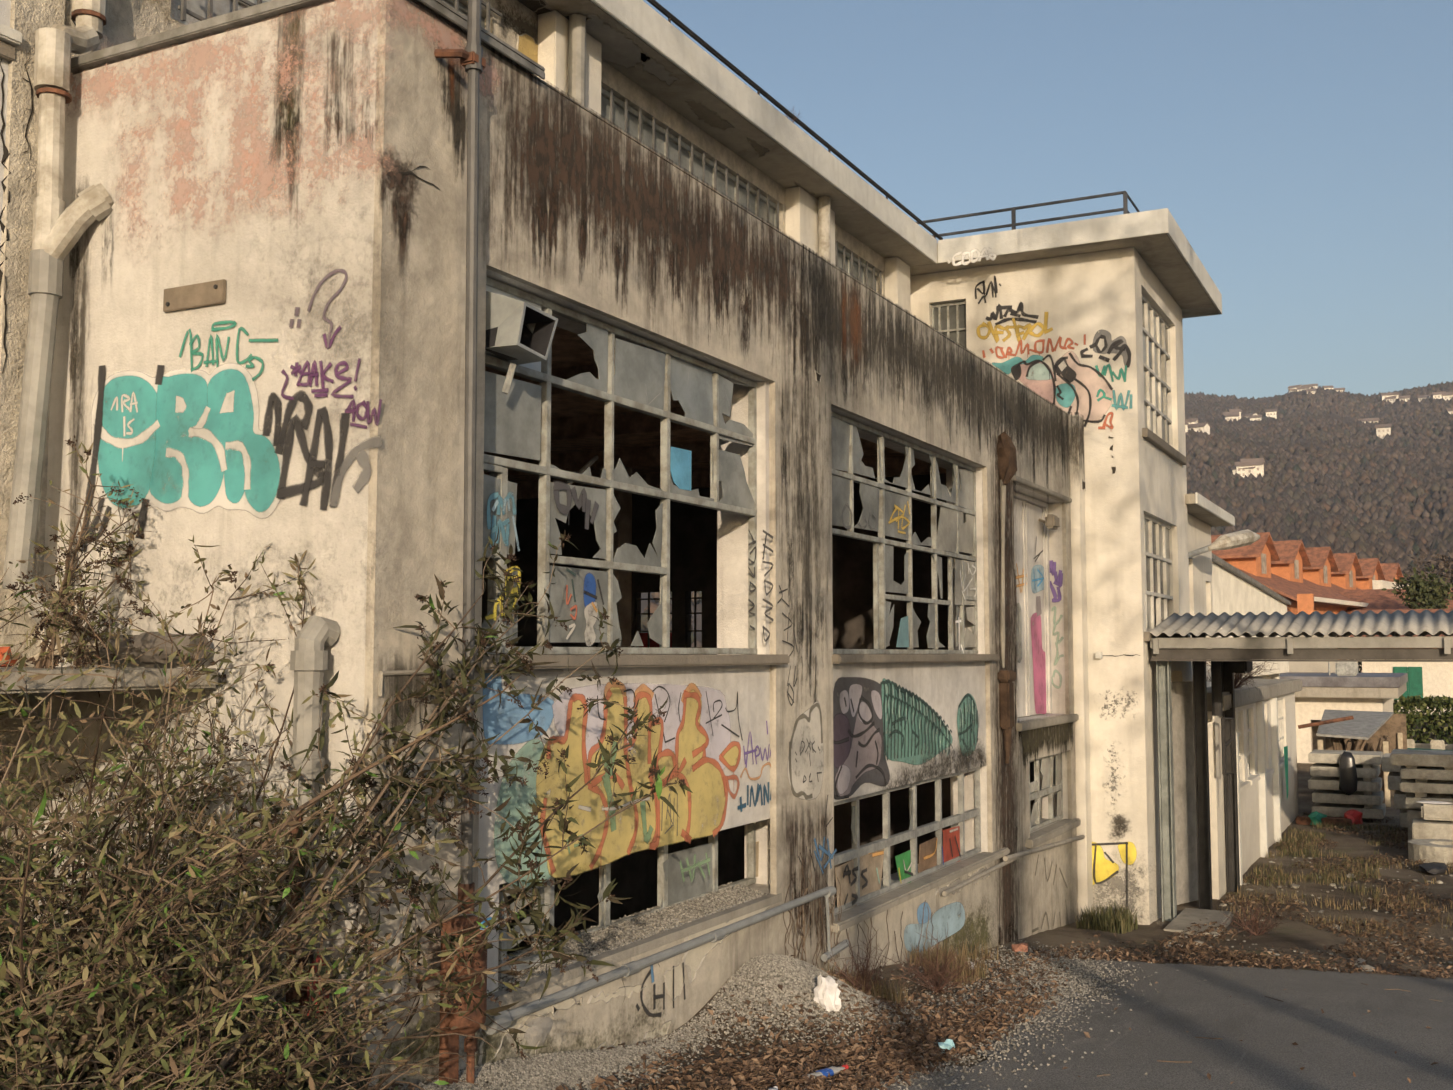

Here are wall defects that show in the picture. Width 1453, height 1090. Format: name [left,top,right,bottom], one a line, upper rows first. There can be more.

water stain [271,8,305,200]
water stain [327,35,353,138]
water stain [439,47,465,154]
crack [0,57,33,374]
water stain [379,152,417,263]
water stain [489,0,1085,955]